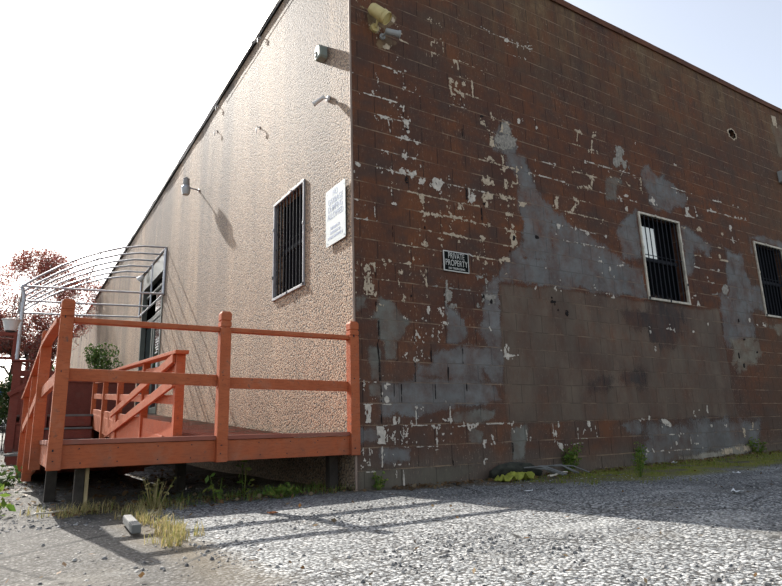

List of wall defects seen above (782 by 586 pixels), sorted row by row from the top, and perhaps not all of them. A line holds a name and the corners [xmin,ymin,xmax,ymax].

spalling [448,59,482,109]
peeling [355,73,658,362]
peeling [694,247,729,298]
peeling [359,375,531,486]
peeling [552,421,598,451]
peeling [646,419,703,455]
spalling [721,422,758,454]